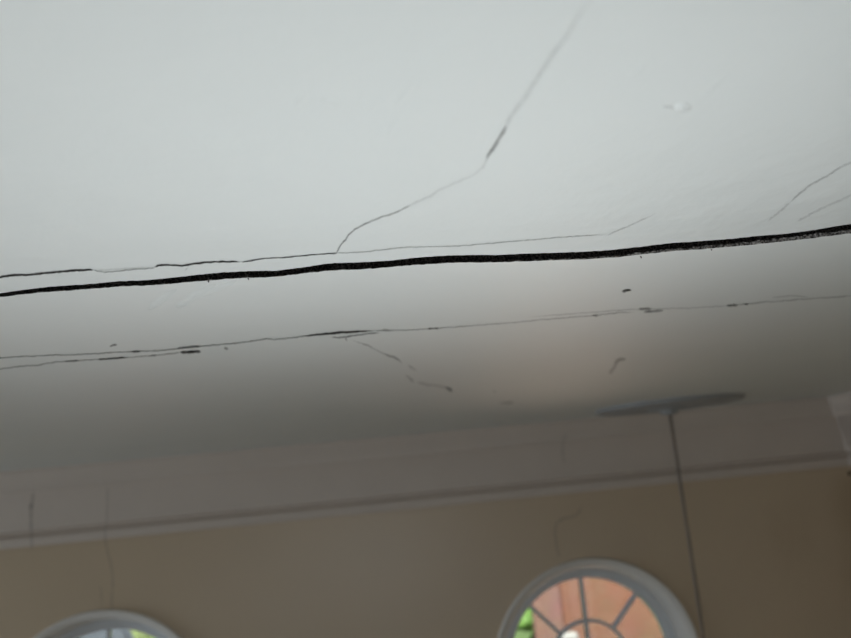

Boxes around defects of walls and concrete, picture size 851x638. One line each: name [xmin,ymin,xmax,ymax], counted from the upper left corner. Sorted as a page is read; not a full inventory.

crack [0,212,851,297]
crack [47,330,375,362]